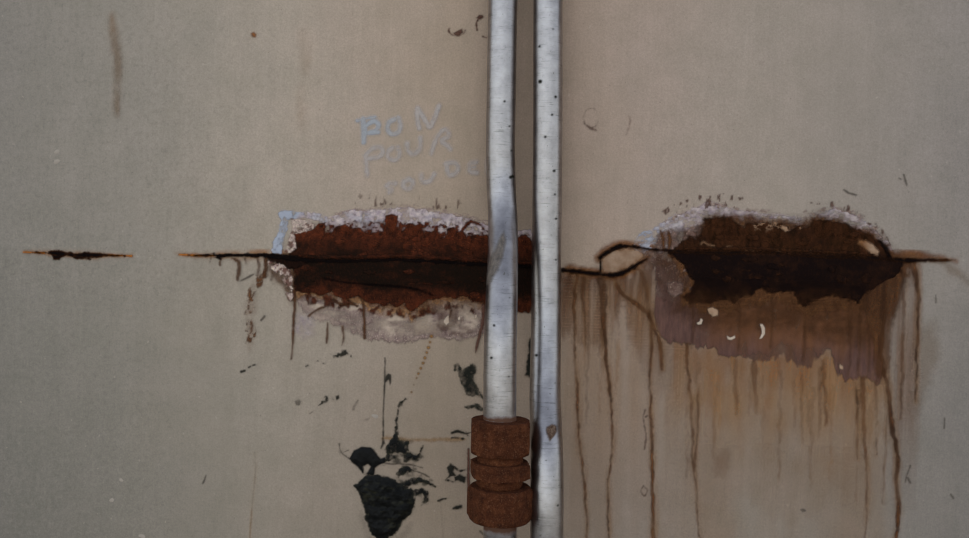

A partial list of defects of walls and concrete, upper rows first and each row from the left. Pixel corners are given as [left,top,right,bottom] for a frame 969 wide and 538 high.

crack [23,250,132,260]
crack [179,253,487,342]
corrosion [271,201,488,379]
corrosion [517,229,532,313]
crack [518,263,532,271]
crack [561,241,951,279]
corrosion [561,195,920,538]